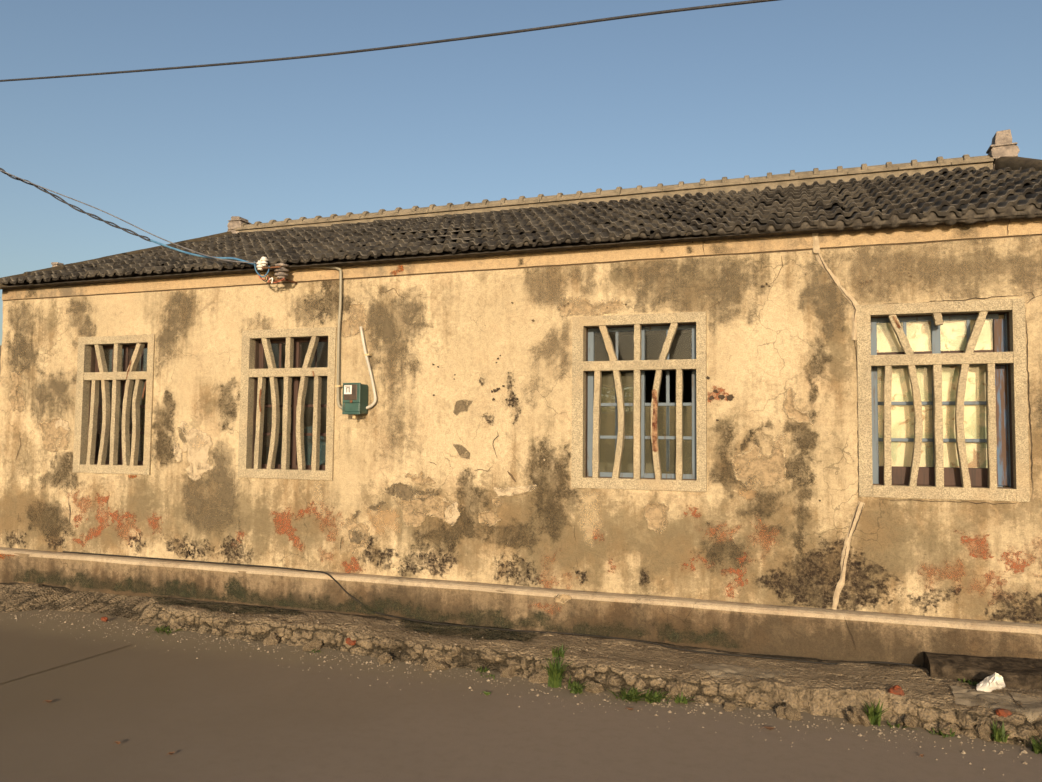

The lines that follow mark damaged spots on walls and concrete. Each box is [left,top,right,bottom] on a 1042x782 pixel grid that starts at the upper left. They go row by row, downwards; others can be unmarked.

damp [618,242,763,330]
damp [7,288,39,377]
damp [155,292,192,376]
peeling [173,421,213,481]
damp [167,384,254,564]
spalling [271,471,460,573]
damp [362,439,599,585]
spalling [478,485,537,527]
spalling [706,376,734,402]
damp [710,223,1042,612]
crack [812,233,1041,646]
flaking render [920,530,1036,604]